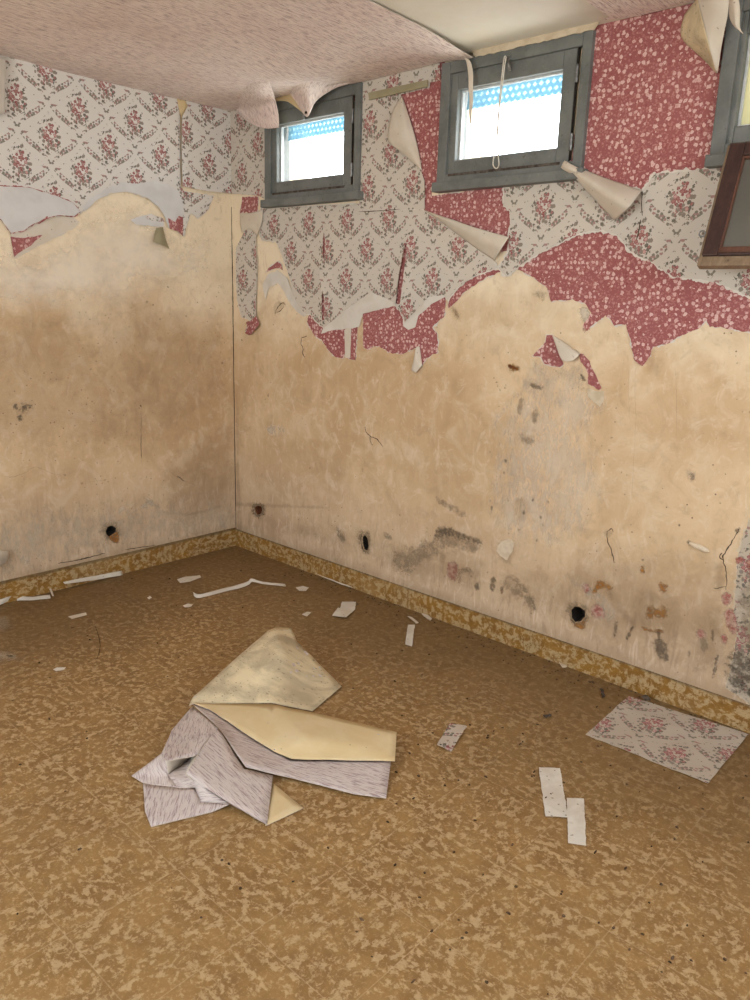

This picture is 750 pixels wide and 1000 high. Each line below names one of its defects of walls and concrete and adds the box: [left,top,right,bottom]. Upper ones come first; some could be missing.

damp [435,528,480,543]
damp [713,653,750,695]